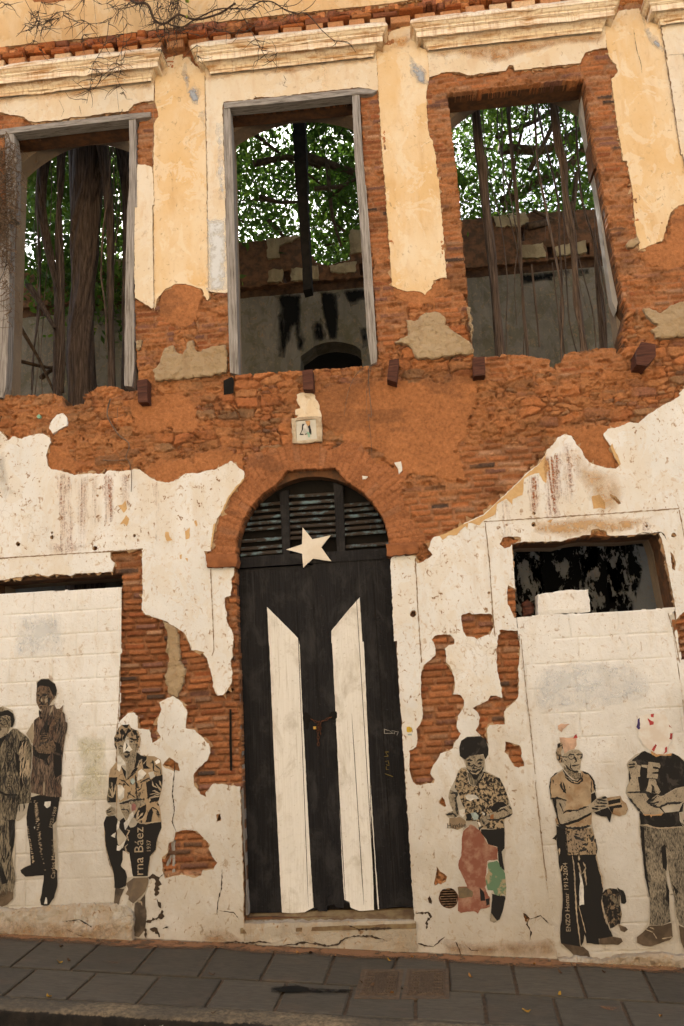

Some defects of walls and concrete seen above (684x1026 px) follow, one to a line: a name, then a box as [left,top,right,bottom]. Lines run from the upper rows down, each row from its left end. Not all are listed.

flaking render [216,13,327,39]
flaking render [614,0,644,19]
flaking render [164,29,200,69]
flaking render [0,45,684,796]
flaking render [162,830,217,877]